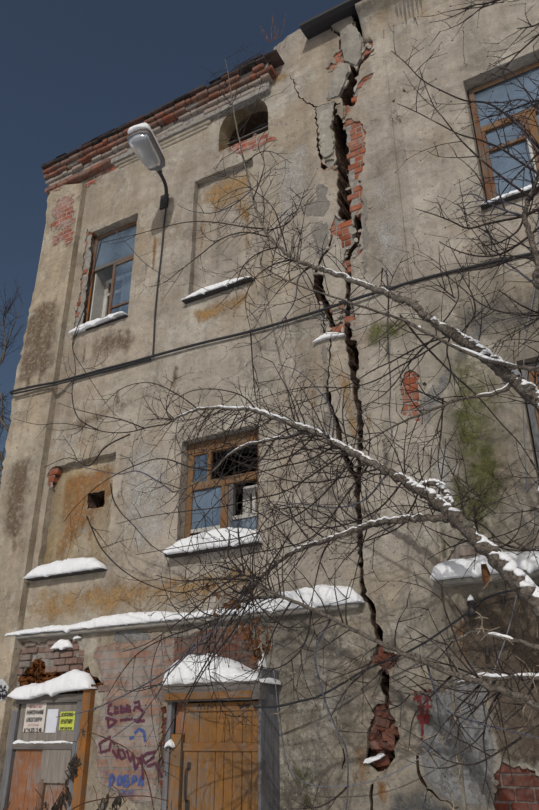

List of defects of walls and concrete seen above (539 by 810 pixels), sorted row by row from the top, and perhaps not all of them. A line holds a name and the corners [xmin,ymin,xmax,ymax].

peeling [216,132,276,158]
peeling [49,186,80,246]
flaking render [75,231,96,327]
damp [21,302,55,386]
crack [290,19,383,647]
flaking render [400,352,464,424]
peeling [17,620,257,807]
crack [378,669,390,708]
peeling [415,584,539,810]